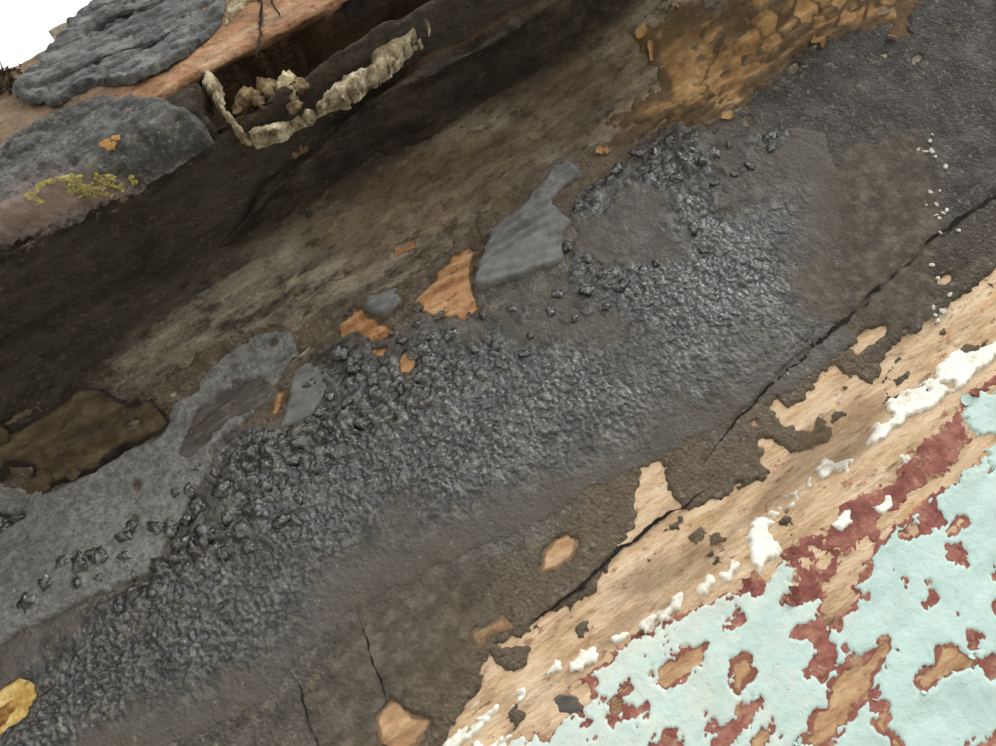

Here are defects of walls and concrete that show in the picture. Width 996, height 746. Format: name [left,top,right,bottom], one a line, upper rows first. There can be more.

spalling [202,19,431,149]
peeling [337,160,583,357]
crack [702,195,996,464]
peeling [696,341,996,606]
peeling [540,534,580,573]
crack [523,487,709,631]
peeling [374,699,432,746]
peeling [554,694,584,715]
peeling [651,641,709,693]
peeling [704,653,770,746]
peeling [789,619,892,746]
peeling [916,631,996,695]